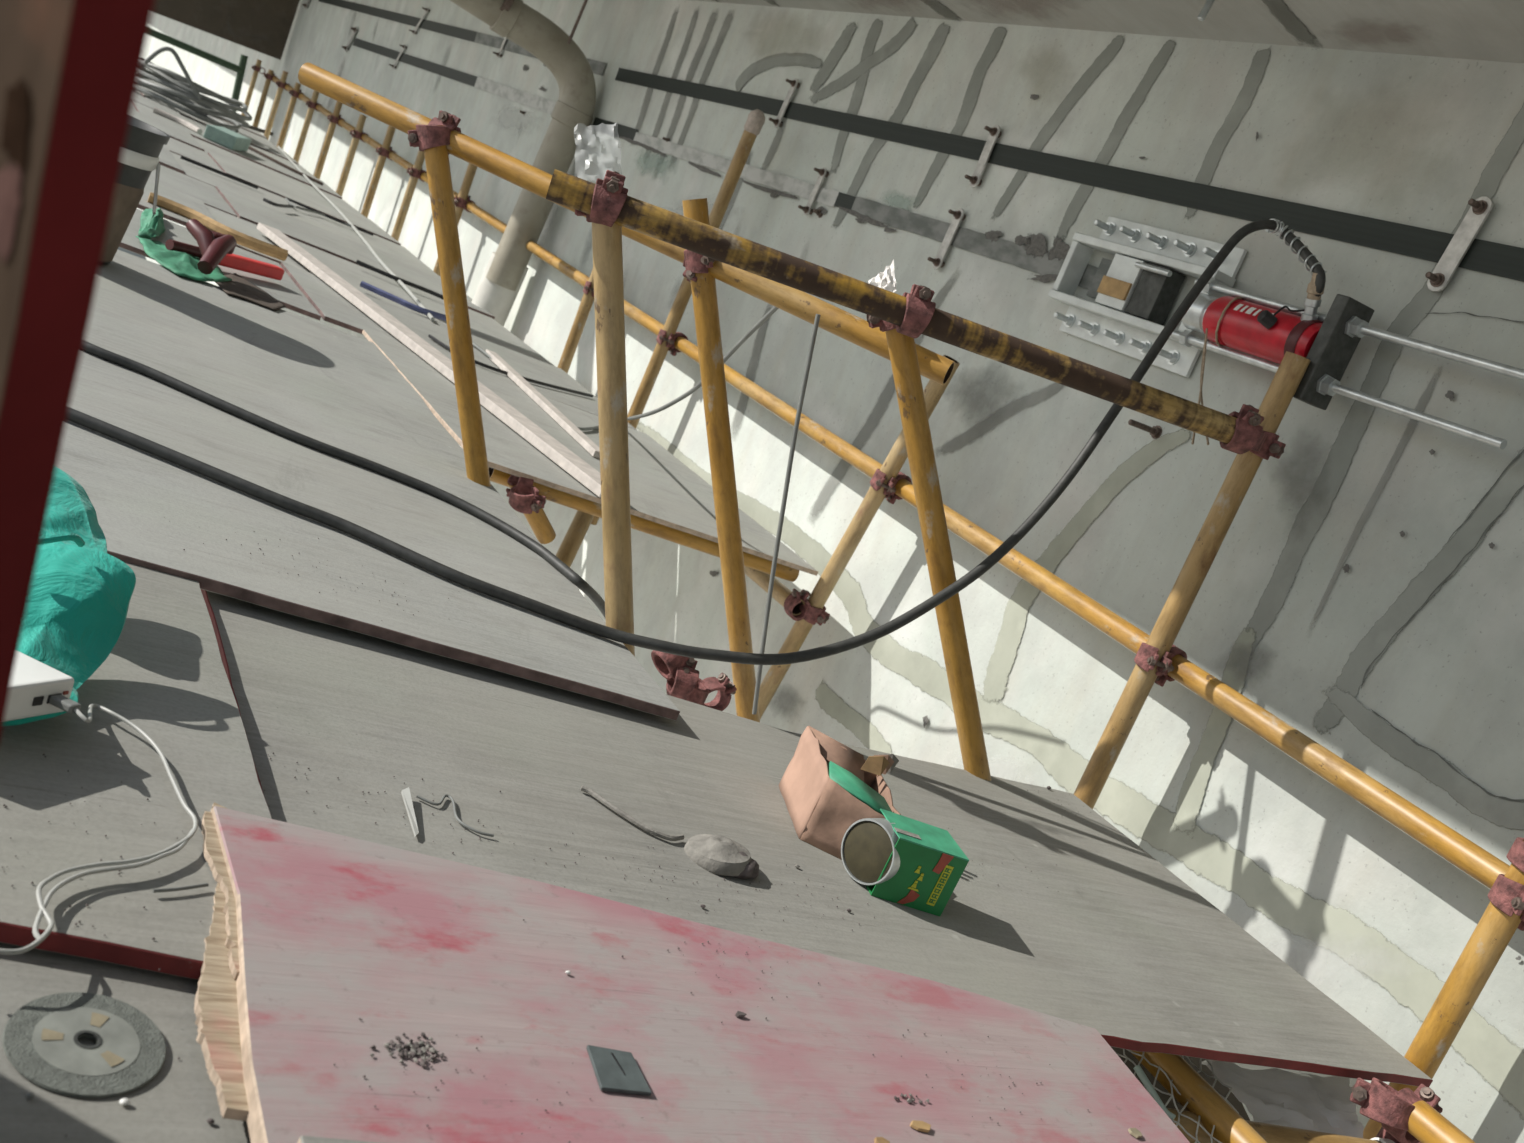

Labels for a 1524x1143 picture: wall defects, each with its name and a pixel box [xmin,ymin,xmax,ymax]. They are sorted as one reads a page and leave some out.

crack [637,103,1524,1119]
crack [991,35,1176,240]